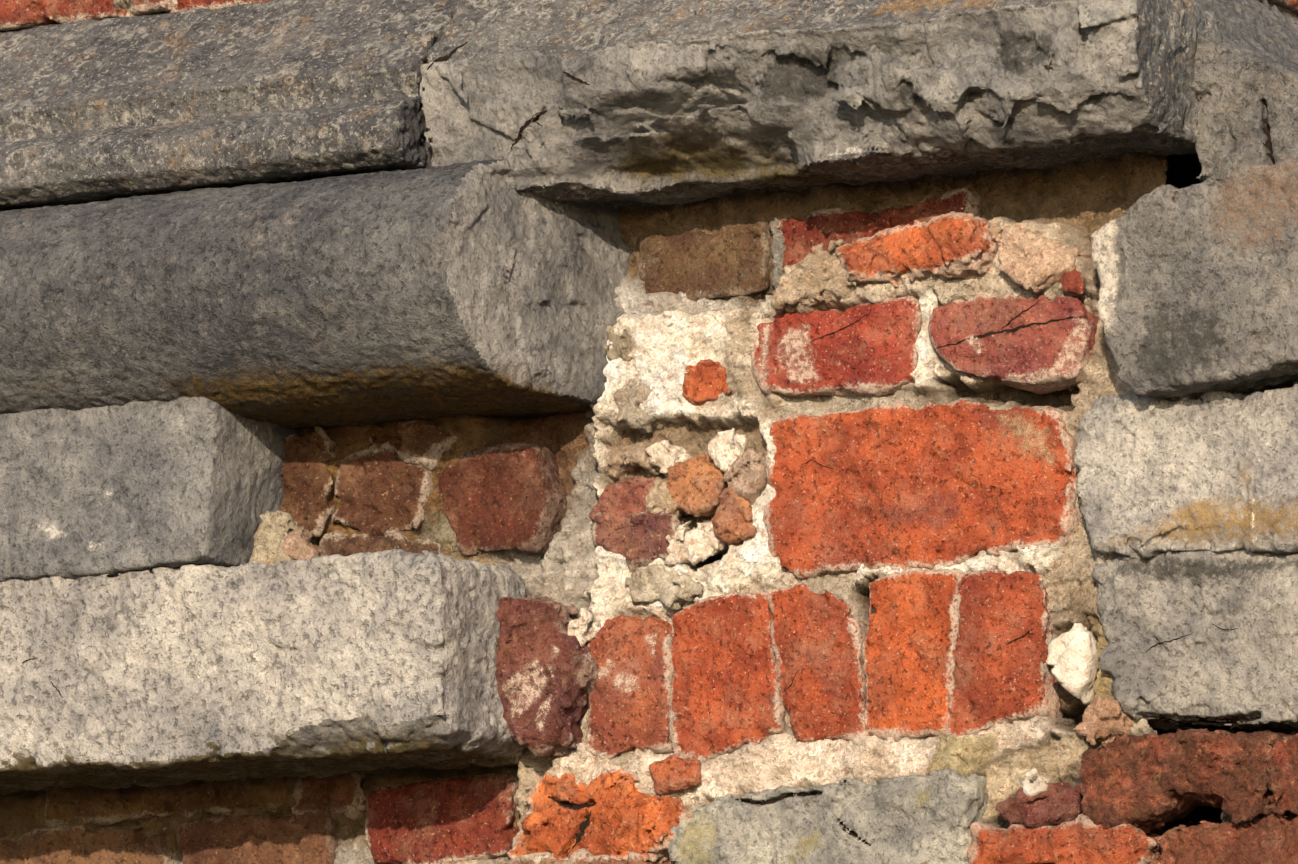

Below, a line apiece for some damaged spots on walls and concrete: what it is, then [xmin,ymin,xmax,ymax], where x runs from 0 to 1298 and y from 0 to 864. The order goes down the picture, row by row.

crack [427,41,468,70]
crack [511,110,548,150]
spalling [397,0,1159,401]
crack [936,300,1082,349]
spalling [523,768,662,855]